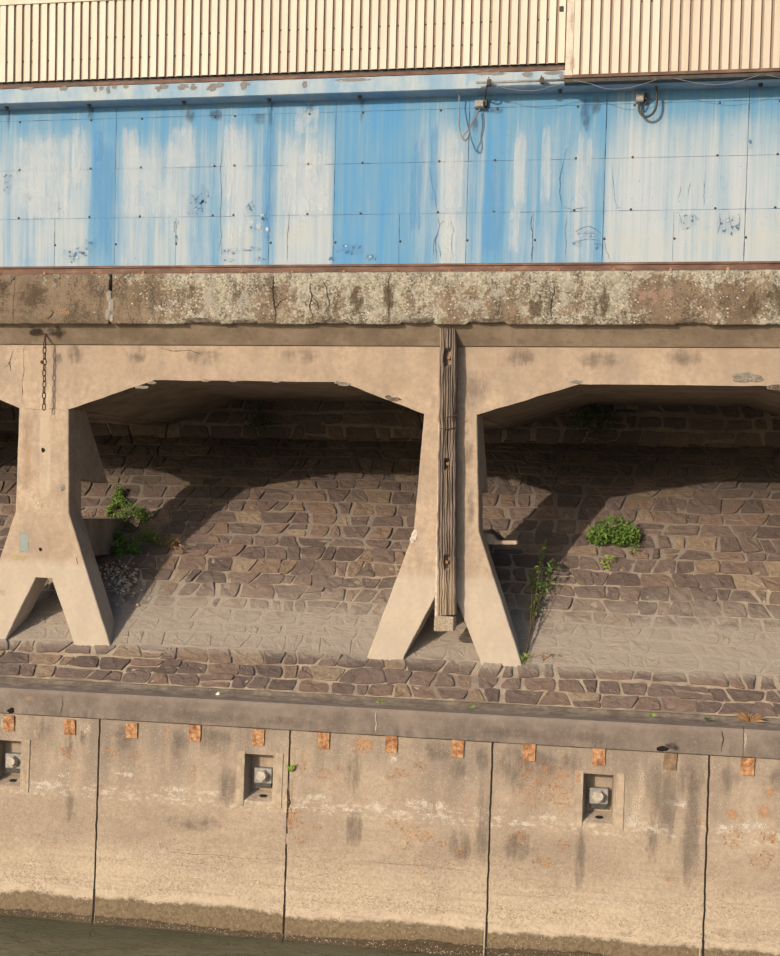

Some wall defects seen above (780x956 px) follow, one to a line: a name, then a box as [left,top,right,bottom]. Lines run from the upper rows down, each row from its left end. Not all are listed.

peeling [155,82,224,92]
crack [270,276,286,324]
crack [309,283,330,317]